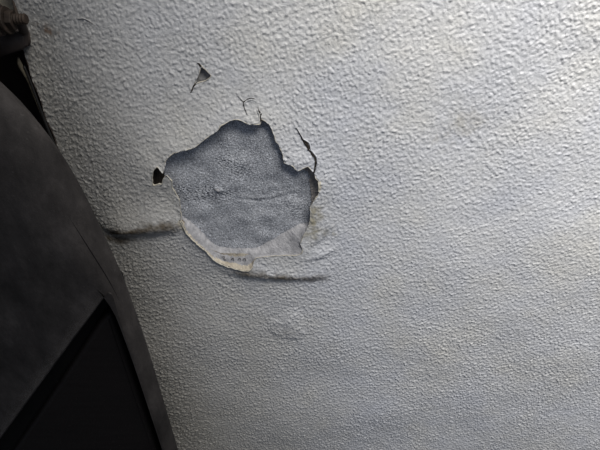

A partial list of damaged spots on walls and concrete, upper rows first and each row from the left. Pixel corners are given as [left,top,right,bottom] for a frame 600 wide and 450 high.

peeling [190,63,211,93]
crack [296,128,318,173]
peeling [152,119,322,272]